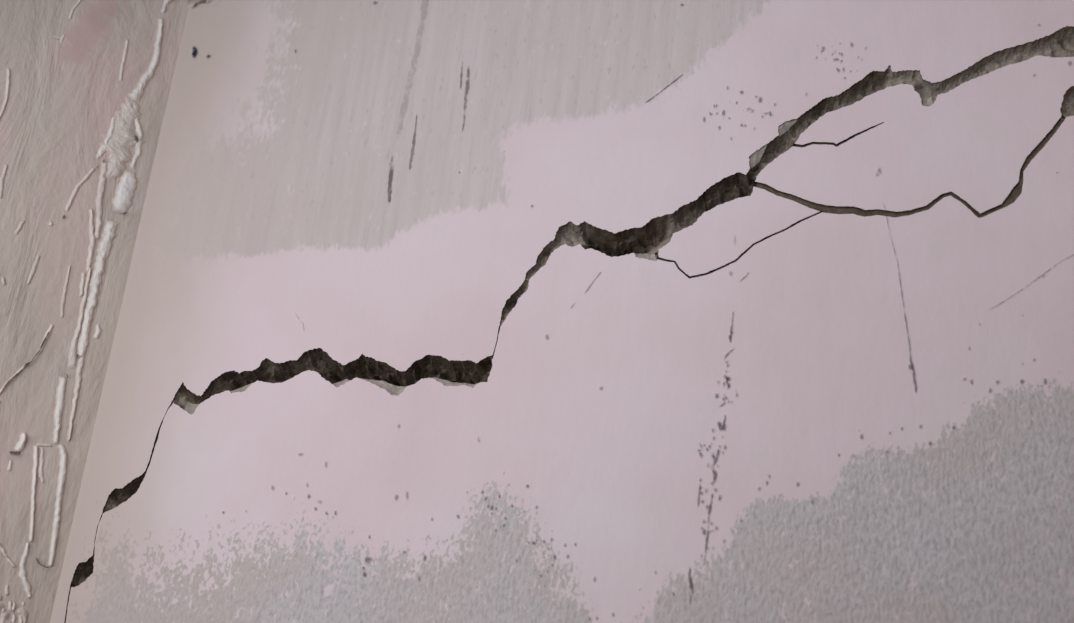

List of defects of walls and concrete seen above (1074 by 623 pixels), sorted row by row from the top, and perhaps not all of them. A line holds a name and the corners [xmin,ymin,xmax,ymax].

crack [48,168,96,227]
peeling [95,0,786,288]
crack [500,26,1074,326]
crack [64,325,500,623]
peeling [63,376,1074,623]